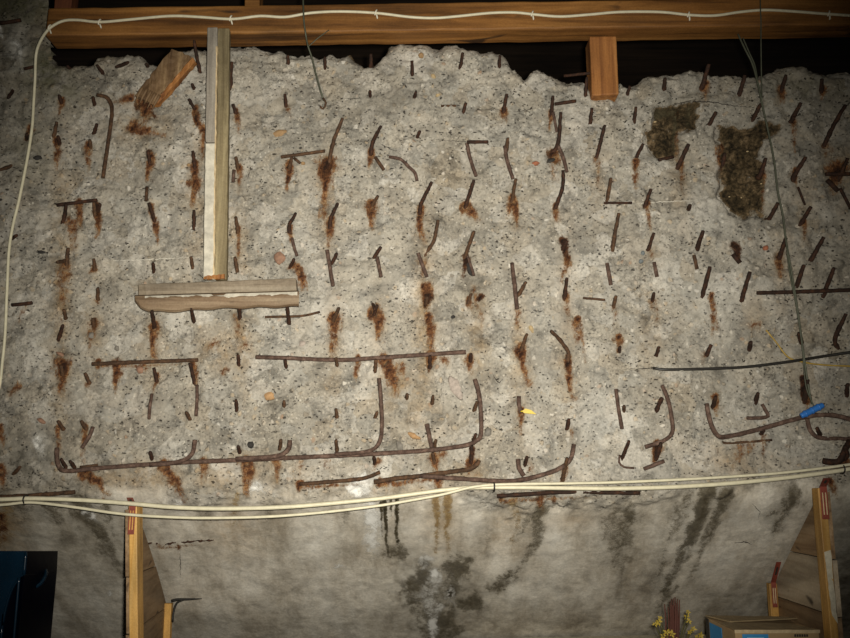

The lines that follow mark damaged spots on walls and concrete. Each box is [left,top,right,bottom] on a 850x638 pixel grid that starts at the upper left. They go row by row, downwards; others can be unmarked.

rust [186,105,206,206]
rust [315,156,338,247]
spalling [635,102,700,170]
spalling [707,102,802,220]
rust [420,259,449,373]
spalling [54,350,641,498]
spalling [705,392,850,465]
rust [233,462,255,524]
leakage [521,506,549,563]
leakage [602,503,635,575]
leakage [659,482,734,607]
leakage [401,554,517,638]